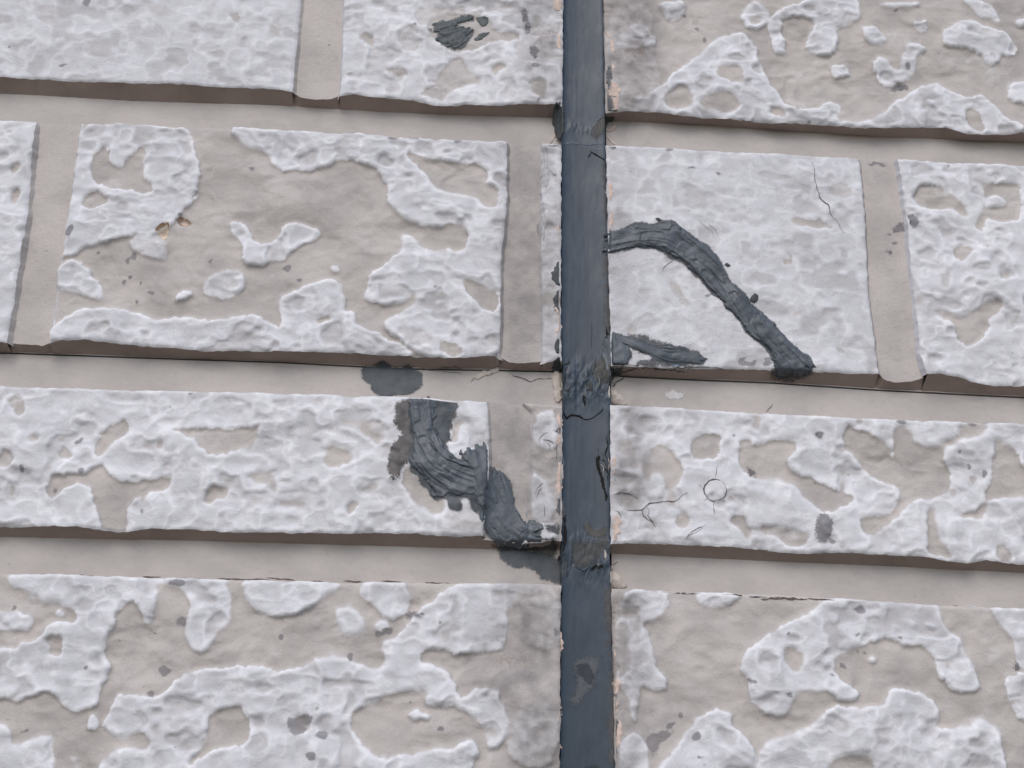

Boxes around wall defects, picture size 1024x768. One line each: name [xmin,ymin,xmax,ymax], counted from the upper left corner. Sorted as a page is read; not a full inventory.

peeling [606,32,621,146]
spalling [155,217,190,240]
peeling [604,514,622,558]
crack [612,466,727,537]
peeling [612,678,623,747]